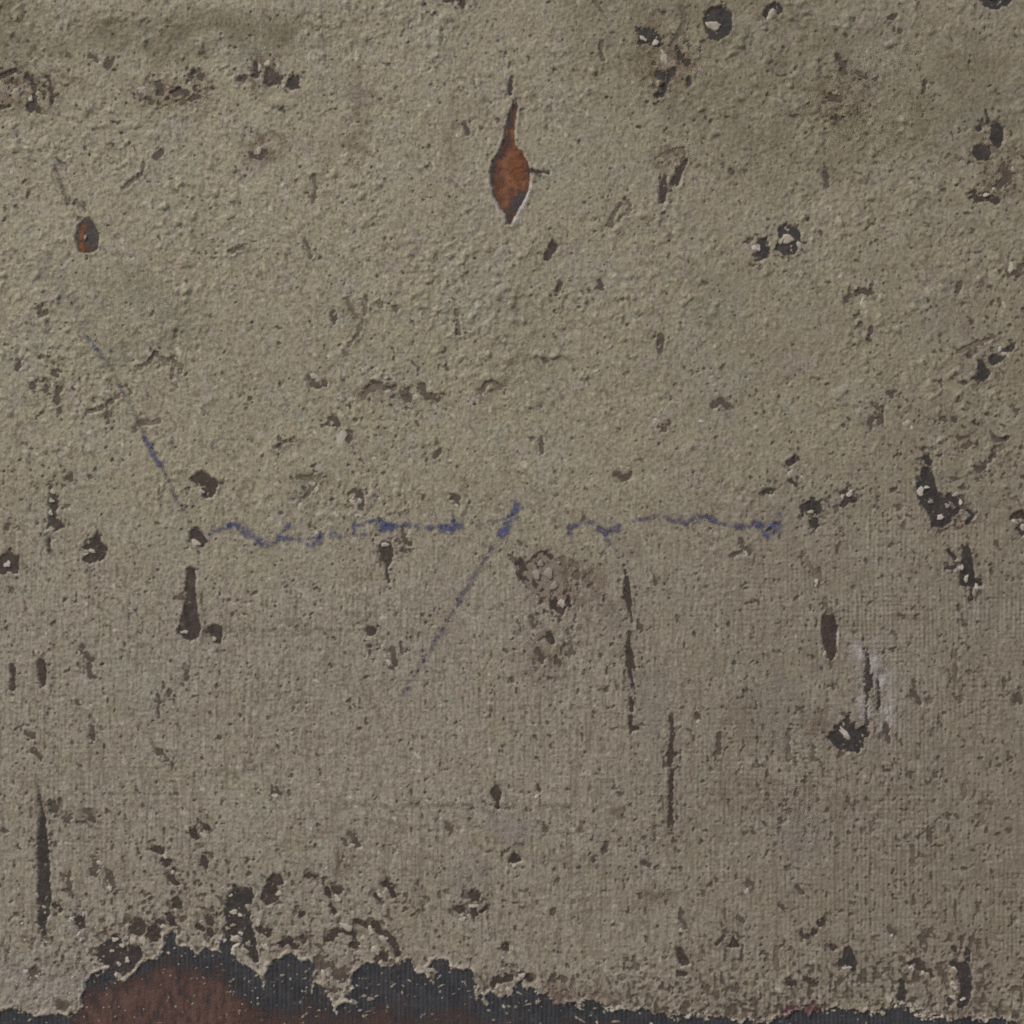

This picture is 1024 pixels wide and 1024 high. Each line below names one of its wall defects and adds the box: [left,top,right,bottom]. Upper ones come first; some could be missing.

peeling [916,455,975,528]
crack [666,714,677,831]
peeling [827,715,869,753]
peeling [0,794,1017,1024]